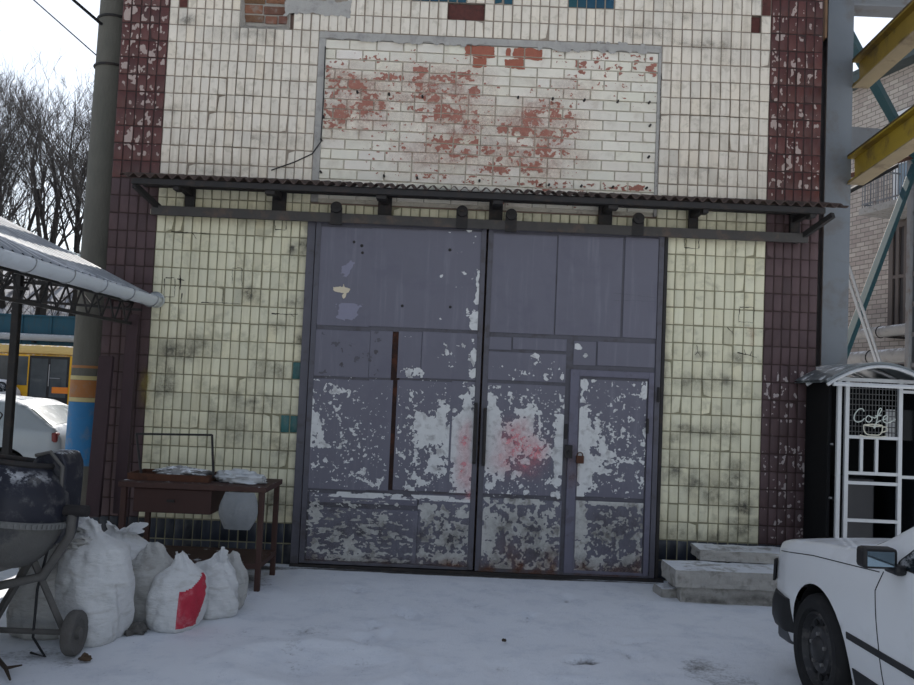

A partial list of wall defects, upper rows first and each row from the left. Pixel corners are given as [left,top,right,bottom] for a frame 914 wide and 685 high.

spalling [117,0,169,158]
spalling [240,0,291,30]
peeling [323,45,657,192]
spalling [751,0,822,196]
peeling [281,415,298,433]
peeling [292,362,300,379]
peeling [305,260,480,566]
peeling [481,353,565,571]
peeling [574,379,647,573]
spalling [763,442,805,539]
spalling [763,371,806,426]